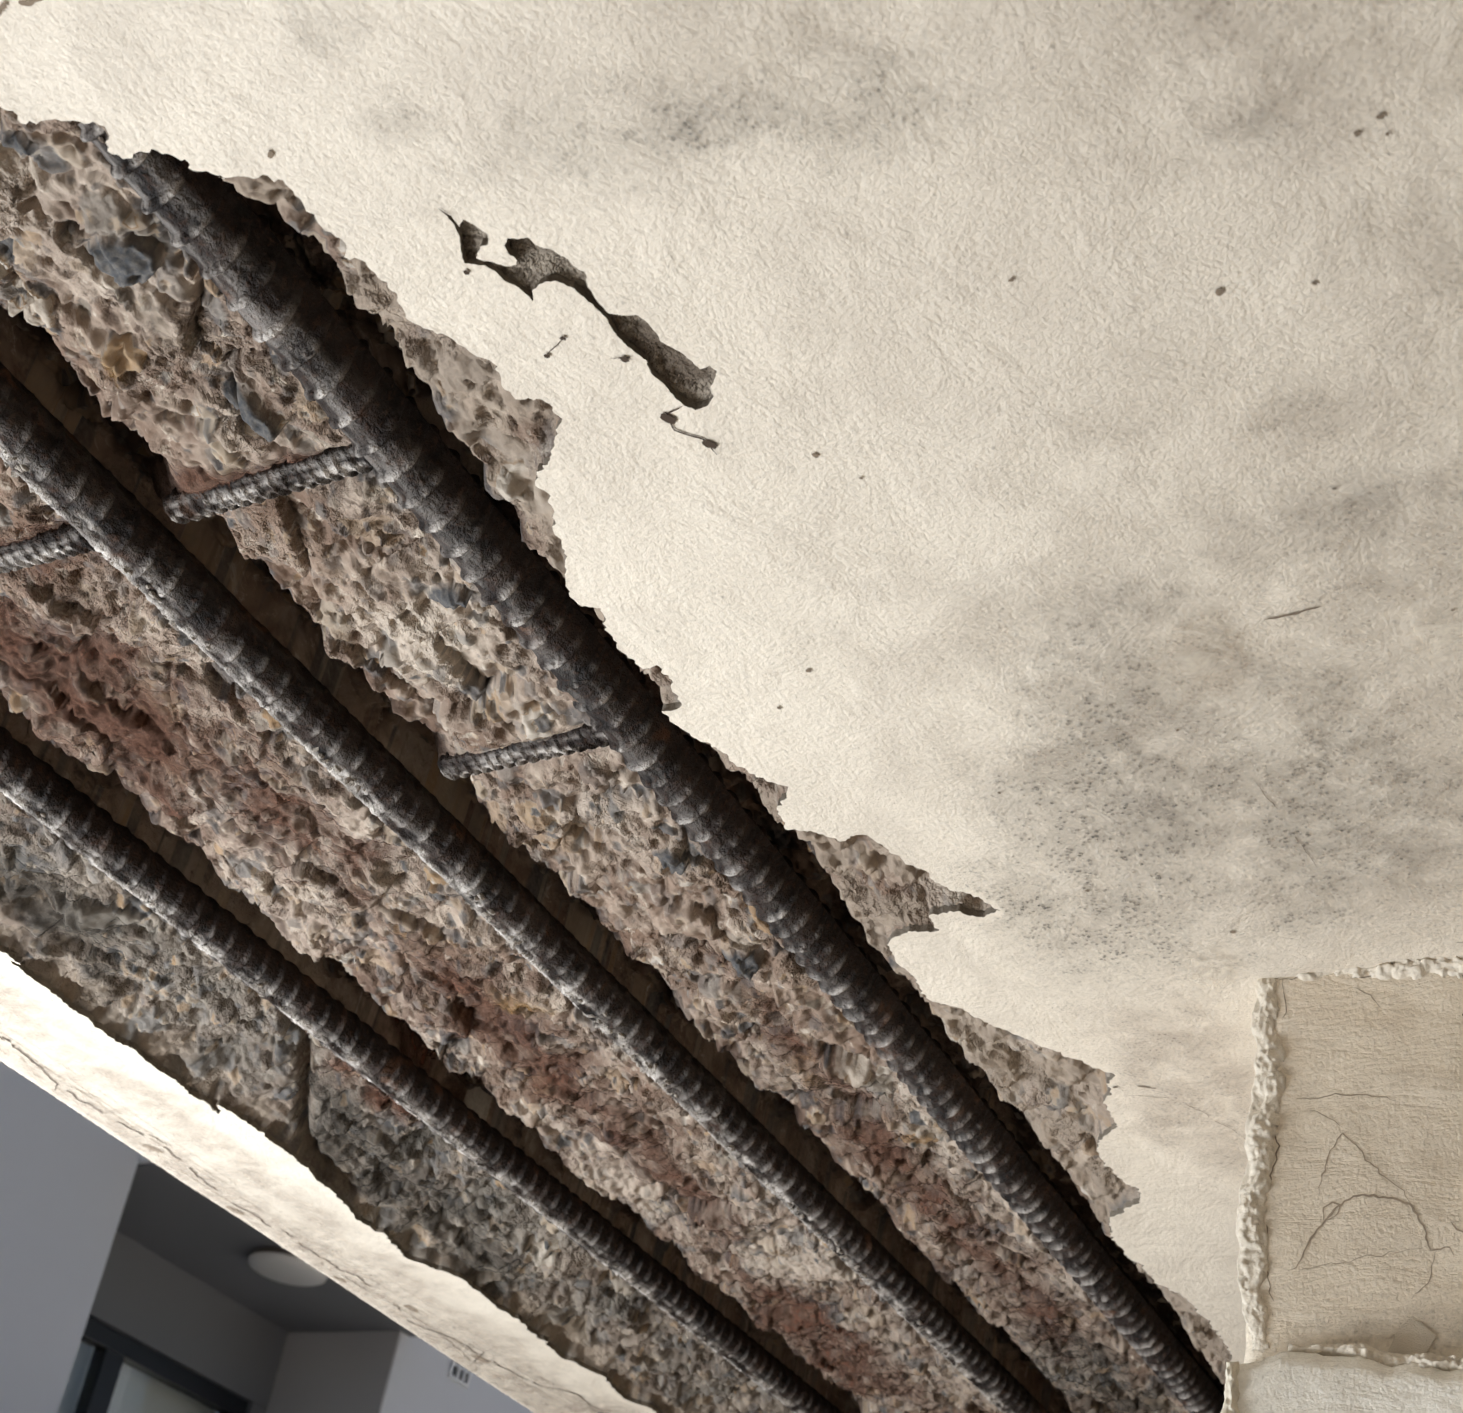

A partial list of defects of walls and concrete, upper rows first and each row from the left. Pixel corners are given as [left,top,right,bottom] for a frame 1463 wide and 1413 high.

rust [0,598,184,819]
rust [231,764,334,850]
rust [334,839,379,897]
spalling [0,107,1232,1413]
mould [1021,700,1194,962]
water stain [1254,731,1426,890]
rust [330,1058,352,1077]
rust [382,1008,437,1073]
rust [431,969,924,1404]
rust [829,1106,1066,1342]
crack [1126,1086,1280,1181]
crack [1267,1093,1463,1314]